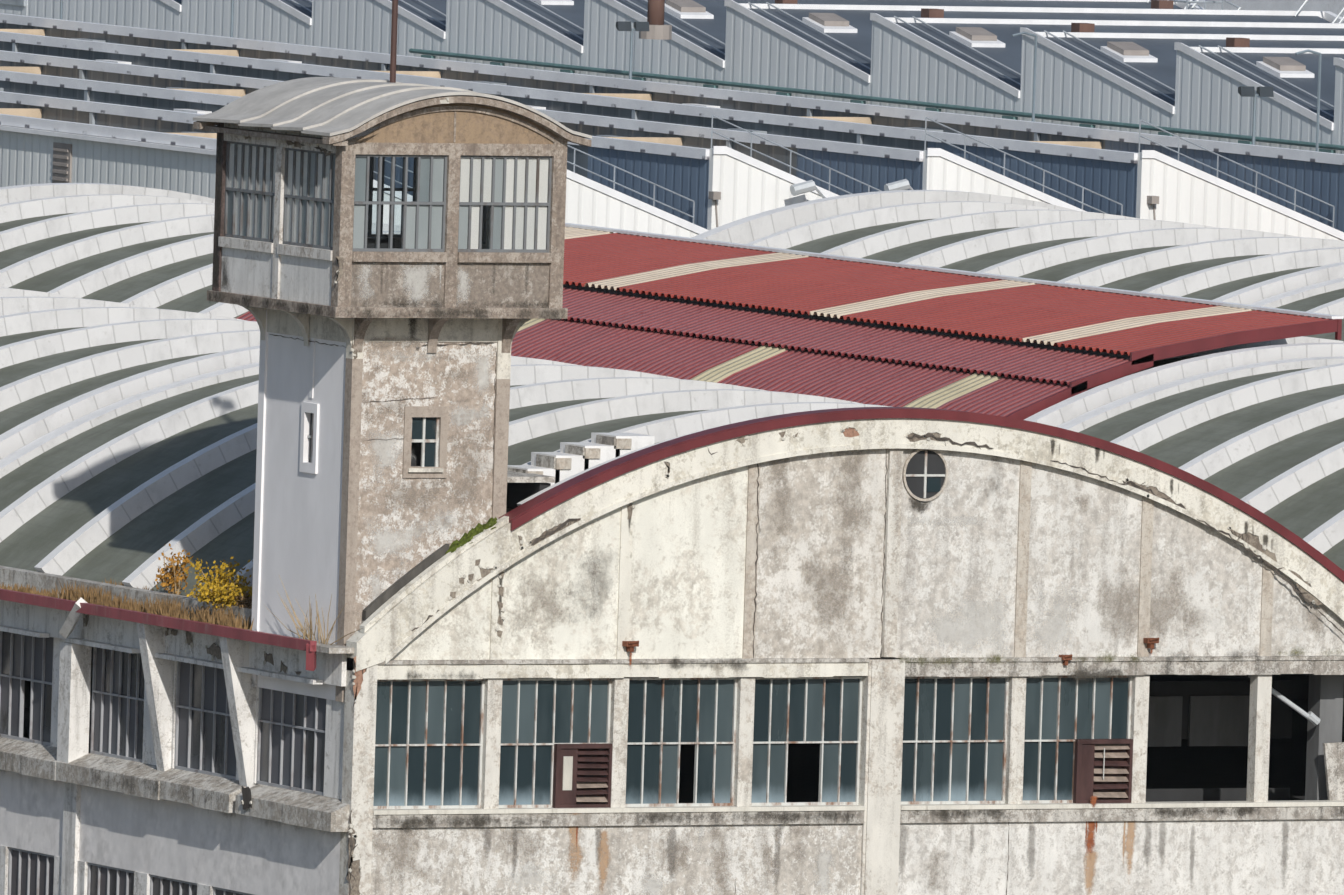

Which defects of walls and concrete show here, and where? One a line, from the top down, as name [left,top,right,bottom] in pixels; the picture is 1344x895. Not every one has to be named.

spalling [1125,477,1176,504]
crack [880,433,994,659]
spalling [448,559,505,638]
crack [347,810,358,895]
corrosion [569,813,582,873]
corrosion [599,831,609,879]
corrosion [1085,796,1097,888]
corrosion [1123,821,1135,869]